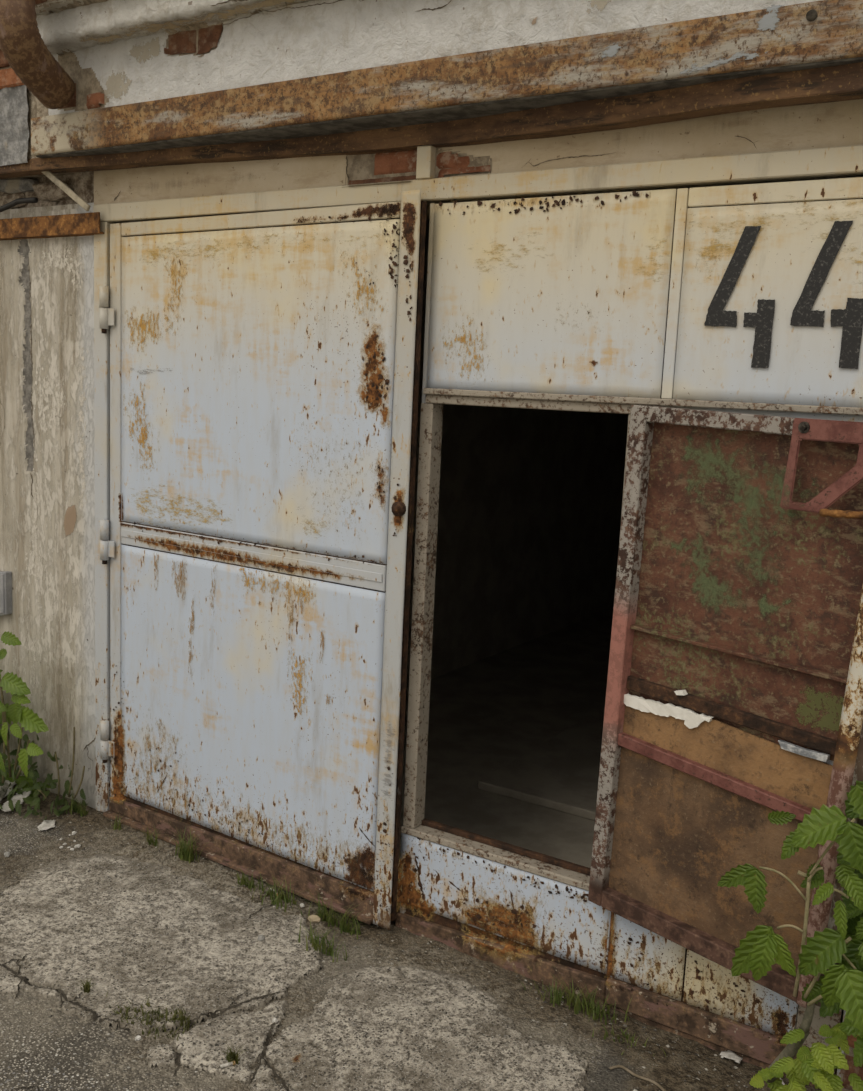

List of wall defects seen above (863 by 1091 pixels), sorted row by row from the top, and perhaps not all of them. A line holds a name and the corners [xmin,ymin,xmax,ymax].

spalling [129,22,223,63]
crack [210,0,363,25]
spalling [342,150,417,188]
spalling [435,148,492,178]
spalling [18,239,87,497]
rust [345,256,390,425]
rust [118,485,382,672]
rust [110,671,206,816]
rust [217,802,436,920]
crack [0,954,131,1029]
crack [173,991,291,1091]
rust [597,921,789,1047]